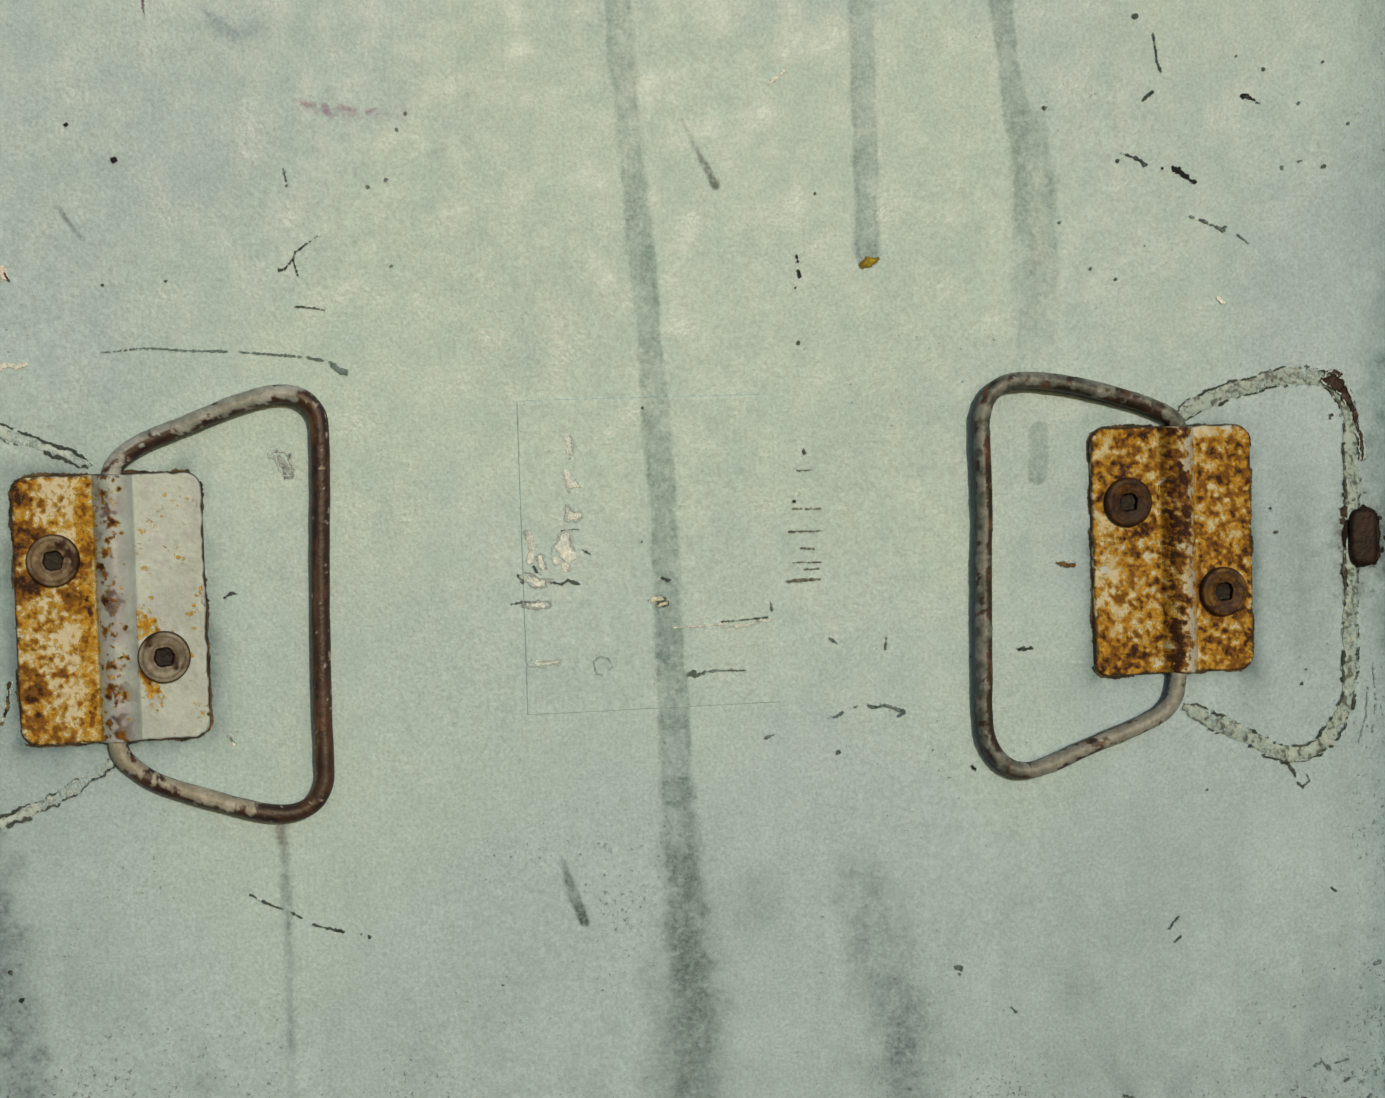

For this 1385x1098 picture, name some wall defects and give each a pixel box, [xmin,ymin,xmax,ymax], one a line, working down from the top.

spalling [1321,368,1366,460]
corrosion [1090,425,1254,676]
peeling [1340,502,1385,586]
corrosion [11,476,173,745]
peeling [0,681,13,726]